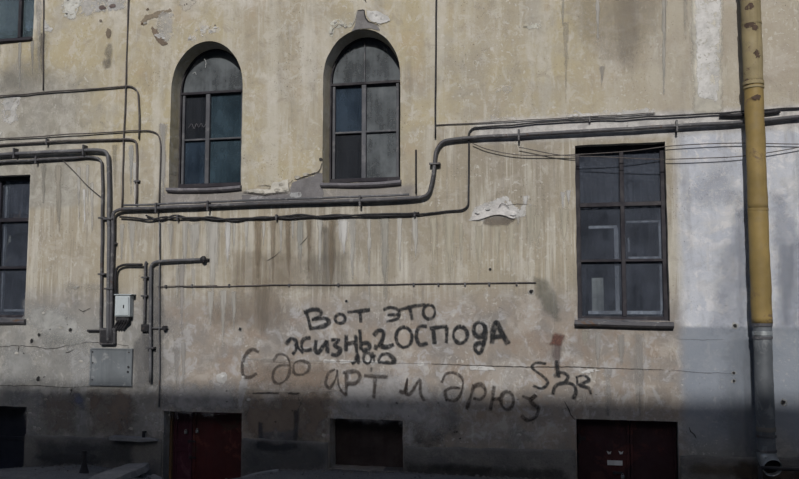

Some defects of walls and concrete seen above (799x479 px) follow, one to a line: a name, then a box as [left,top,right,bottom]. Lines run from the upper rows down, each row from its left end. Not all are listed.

flaking render [141,8,174,46]
flaking render [329,9,390,37]
flaking render [242,173,324,203]
water stain [338,218,355,275]
water stain [176,220,248,343]